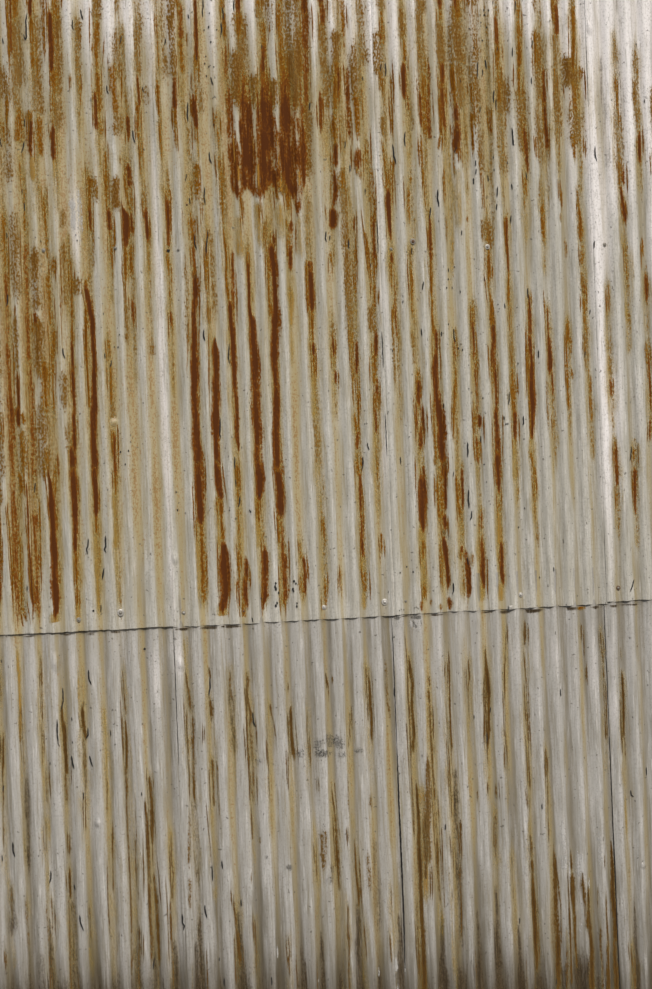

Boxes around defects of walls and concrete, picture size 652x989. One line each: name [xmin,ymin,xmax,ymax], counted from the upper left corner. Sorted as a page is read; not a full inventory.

corrosion [0,0,594,626]
corrosion [605,285,614,421]
corrosion [612,33,652,547]
damp [192,922,209,989]
damp [237,915,248,989]
damp [296,936,326,989]
damp [356,905,365,989]
damp [426,915,484,989]
damp [494,892,504,989]
damp [518,926,545,989]
damp [553,841,619,989]